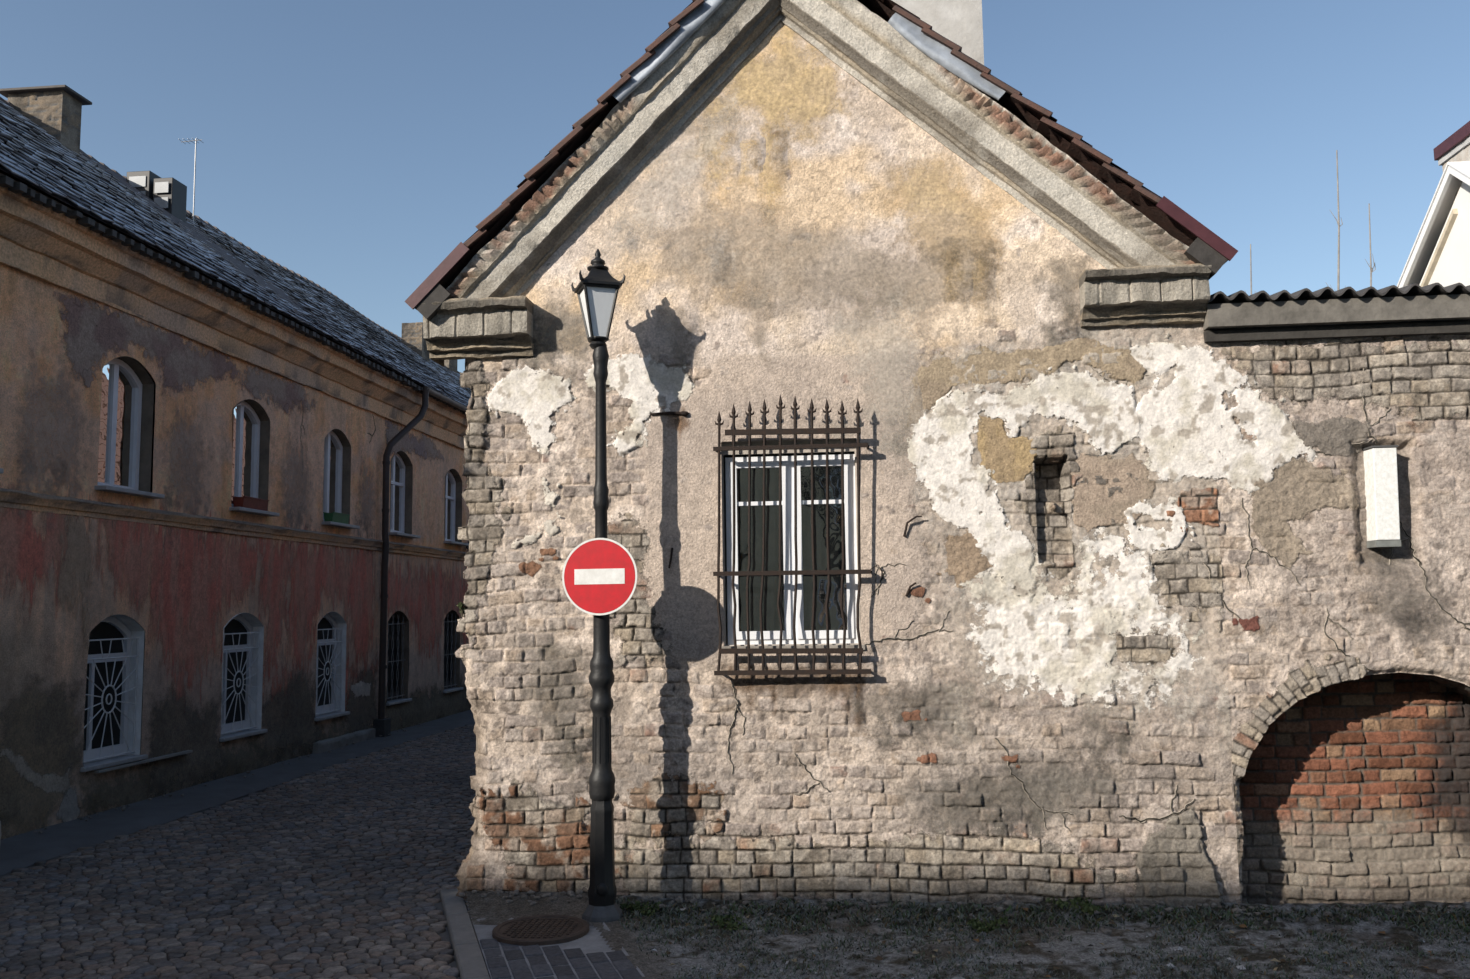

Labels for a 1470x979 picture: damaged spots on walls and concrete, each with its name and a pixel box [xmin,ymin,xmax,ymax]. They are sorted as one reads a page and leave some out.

spalling [457,349,695,667]
peeling [904,333,1470,717]
crack [1389,517,1470,631]
spalling [476,779,592,892]
spalling [612,767,1128,904]